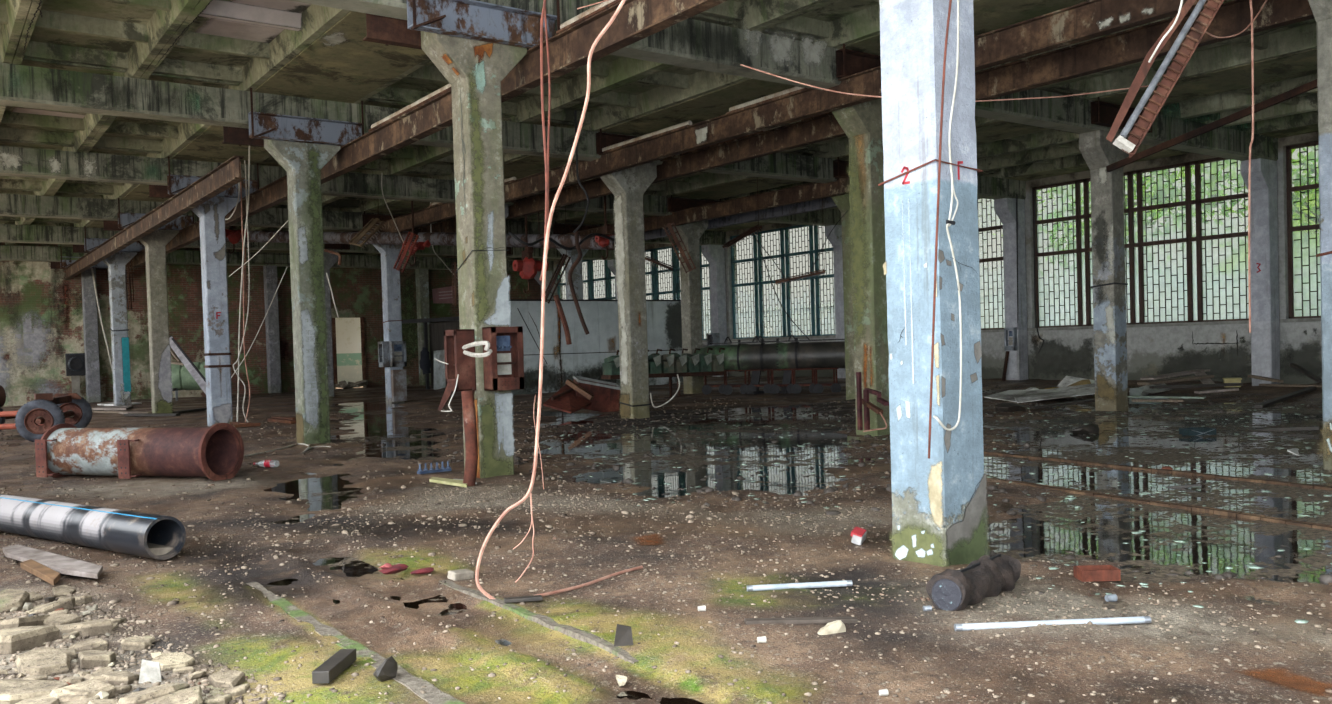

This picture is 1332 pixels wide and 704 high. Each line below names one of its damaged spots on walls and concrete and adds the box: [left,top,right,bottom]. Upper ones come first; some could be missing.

peeling [924,250,951,297]
peeling [970,341,982,383]
leakage [1031,338,1117,401]
leakage [1157,342,1252,380]
leakage [1281,341,1322,378]
spalling [895,423,989,566]